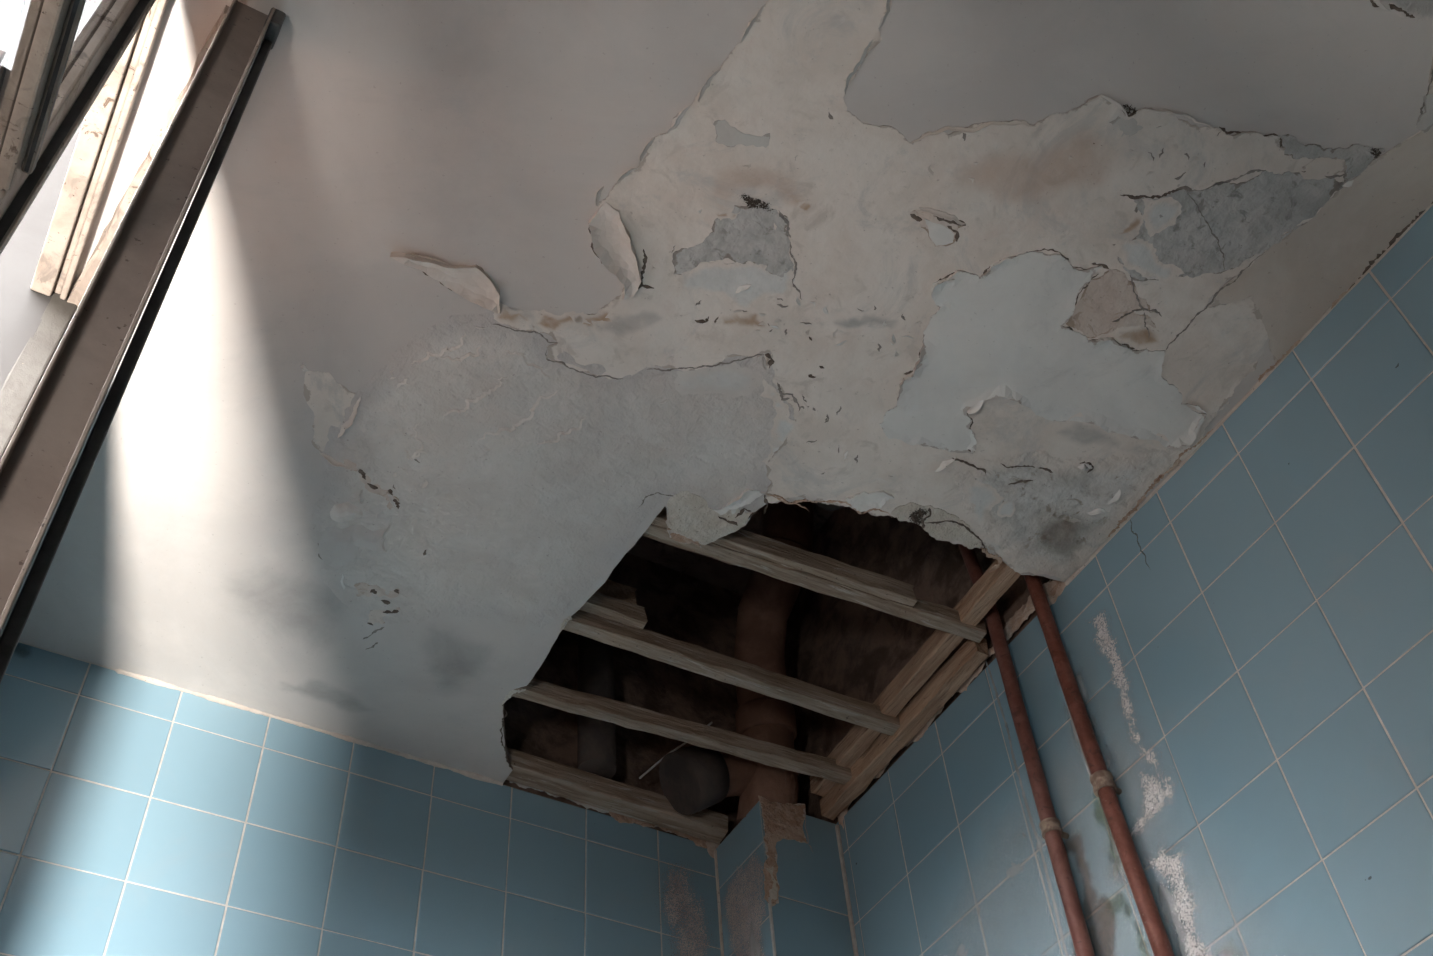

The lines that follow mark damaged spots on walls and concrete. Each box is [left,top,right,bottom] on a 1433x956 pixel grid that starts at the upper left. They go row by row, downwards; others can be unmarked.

peeling [493,0,1384,693]
peeling [300,365,400,553]
flaking render [500,689,720,858]
leakage [1131,771,1170,838]
rust [1064,837,1114,956]